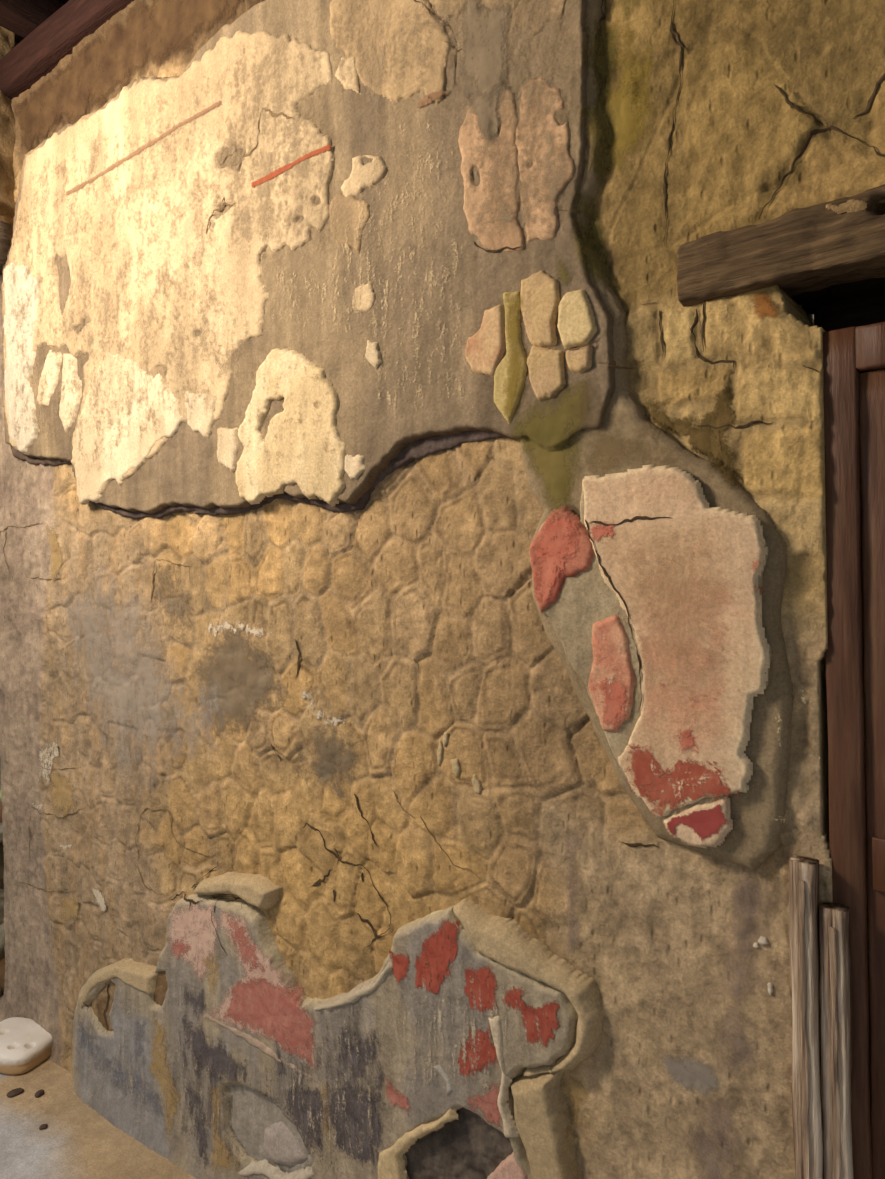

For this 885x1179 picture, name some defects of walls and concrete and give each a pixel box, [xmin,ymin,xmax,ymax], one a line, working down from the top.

crack [663,0,685,245]
crack [759,73,885,219]
flaking render [1,0,616,519]
leakage [505,297,522,414]
crack [567,302,664,369]
crack [690,300,735,373]
crack [698,420,774,450]
crack [585,516,671,714]
crack [298,794,391,953]
spalling [90,981,116,1031]
spalling [154,966,168,1006]
spalling [172,1005,528,1179]